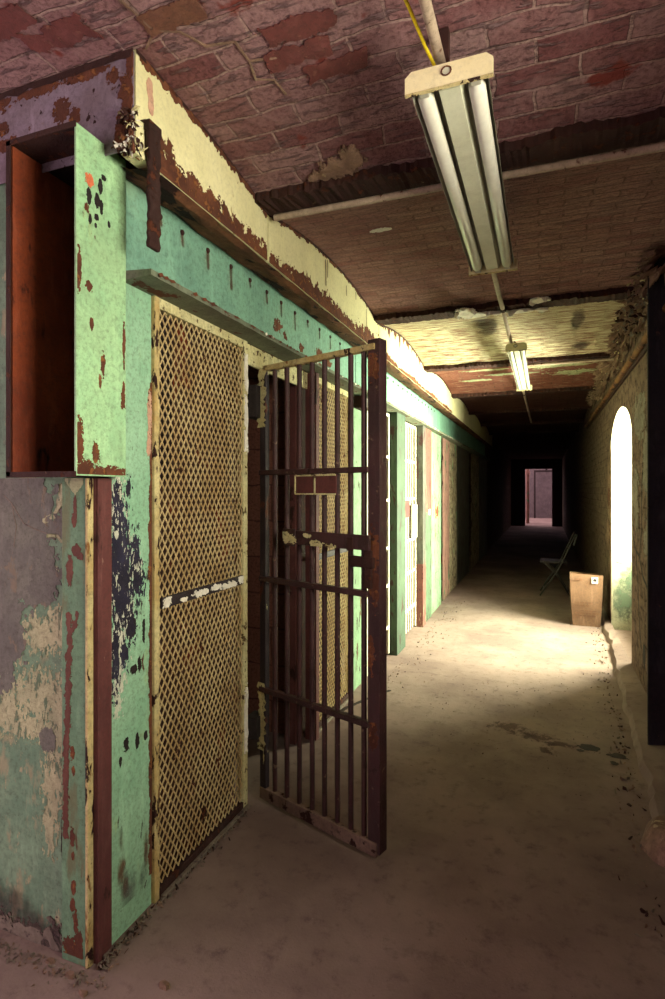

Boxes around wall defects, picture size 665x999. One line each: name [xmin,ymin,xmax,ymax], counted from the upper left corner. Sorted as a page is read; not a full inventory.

rust [0,48,134,154]
peeling [85,172,111,228]
peeling [139,56,379,344]
peeling [112,474,149,720]
peeling [162,576,244,609]
peeling [0,478,83,862]
rust [62,611,79,860]
peeling [119,731,148,768]
rust [62,880,83,959]